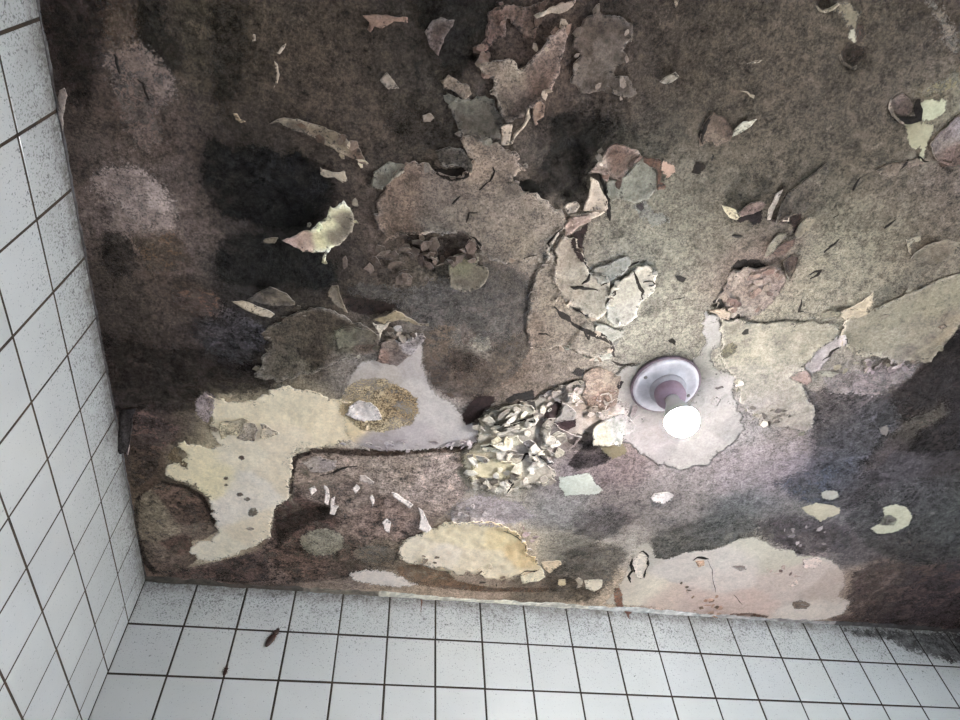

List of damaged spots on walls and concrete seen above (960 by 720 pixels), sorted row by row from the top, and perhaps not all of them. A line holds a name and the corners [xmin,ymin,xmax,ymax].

damp [195,133,540,346]
spalling [165,0,960,621]
crack [798,215,840,313]
damp [651,329,960,664]